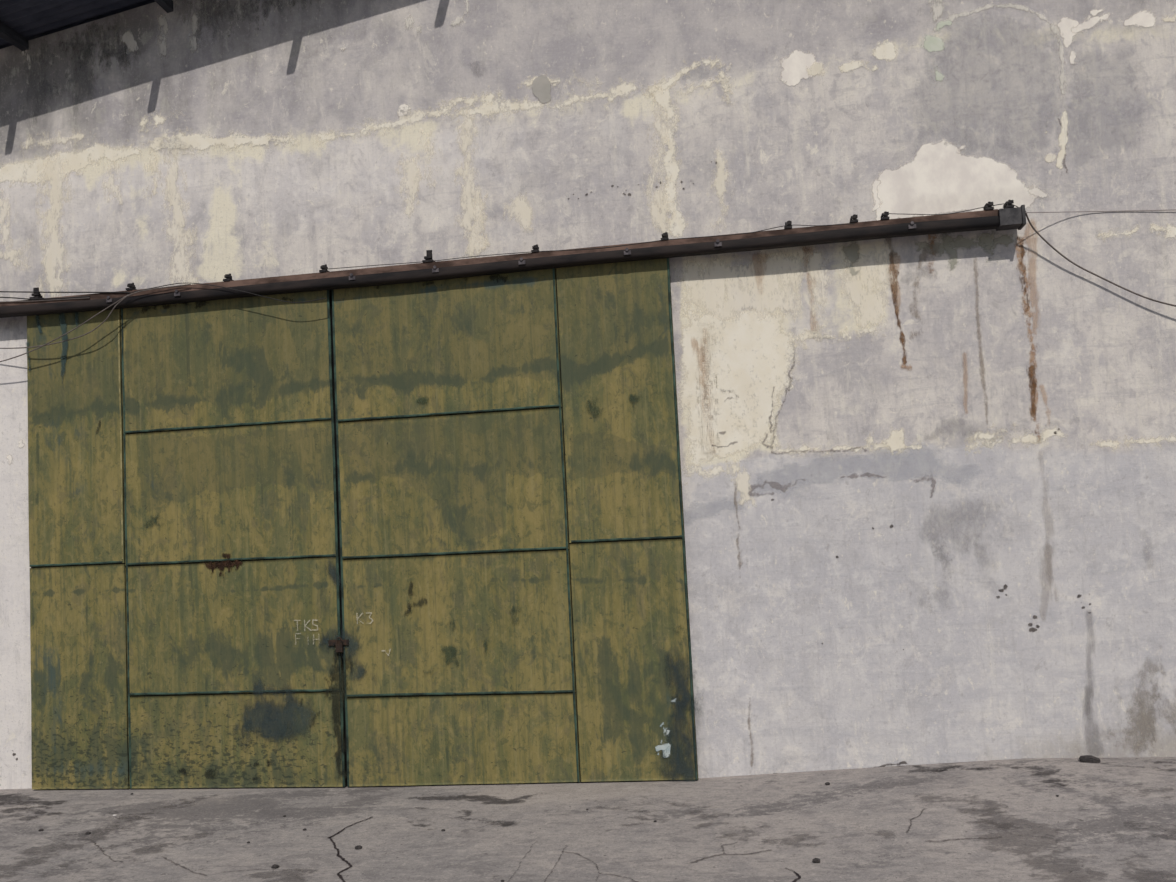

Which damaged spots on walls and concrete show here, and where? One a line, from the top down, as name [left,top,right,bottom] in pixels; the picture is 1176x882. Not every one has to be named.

damp [121,31,138,52]
peeling [780,50,824,86]
peeling [839,39,896,72]
peeling [1057,9,1110,64]
peeling [1124,10,1176,27]
peeling [872,139,1048,220]
corrosion [889,252,910,370]
corrosion [1016,236,1041,440]
peeling [676,251,922,504]
corrosion [205,553,243,577]
crack [328,817,371,882]
crack [693,843,801,882]